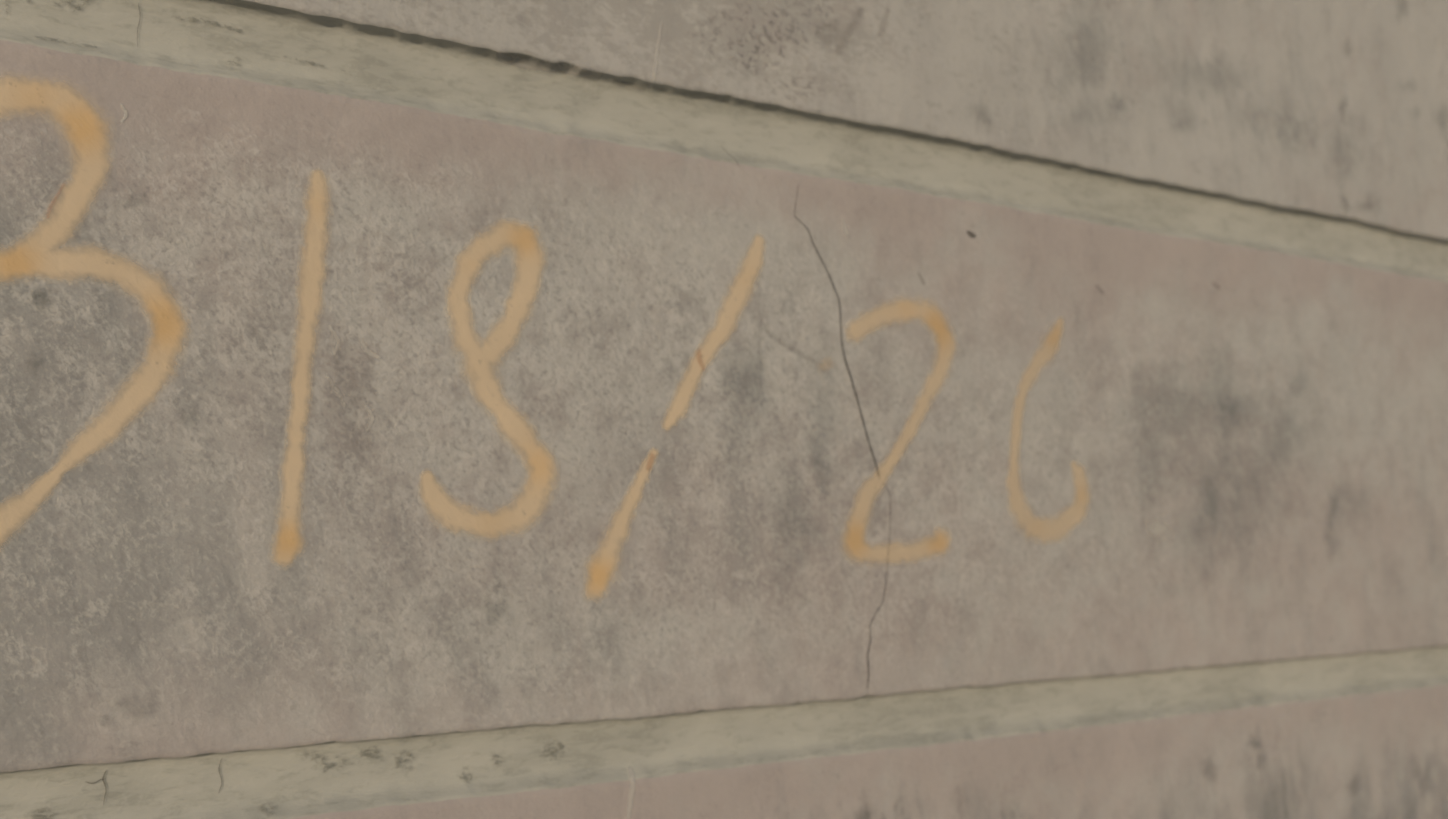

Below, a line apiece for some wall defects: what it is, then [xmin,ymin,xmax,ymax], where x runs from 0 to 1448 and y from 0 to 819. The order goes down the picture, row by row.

crack [794,203,891,686]